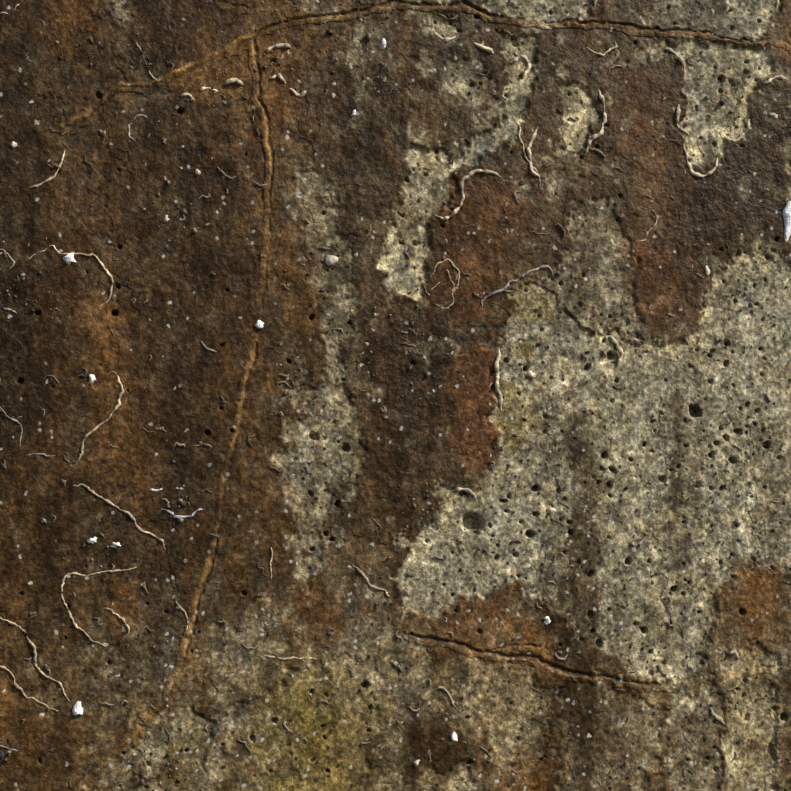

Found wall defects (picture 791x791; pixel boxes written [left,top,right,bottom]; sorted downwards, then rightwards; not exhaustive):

rust [172,0,318,139]
crack [51,0,791,322]
rust [590,34,707,355]
rust [254,215,329,376]
rust [394,147,549,498]
rust [67,283,161,533]
rust [0,630,39,785]
rust [100,565,153,645]
crack [70,326,263,791]
crack [403,632,778,692]
rust [700,544,791,671]
rust [736,729,774,762]